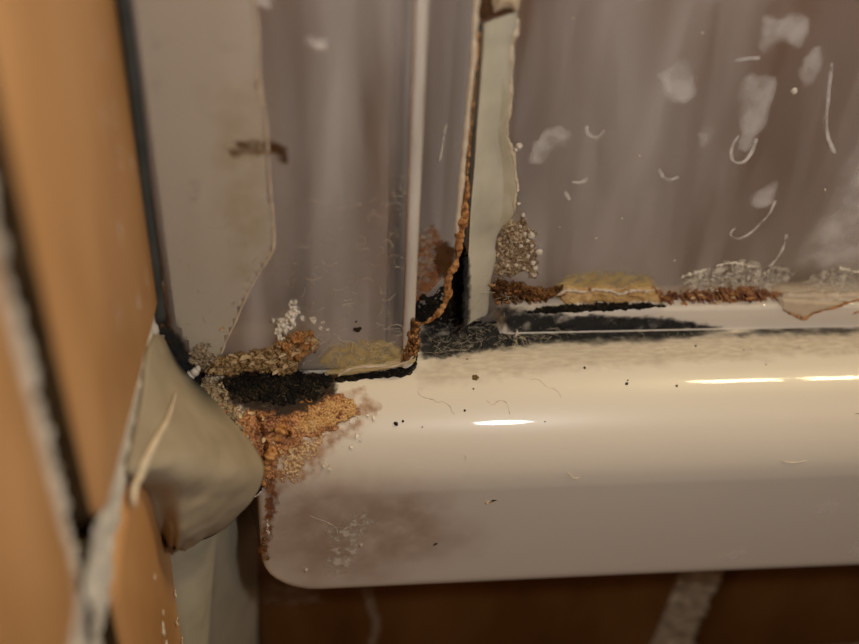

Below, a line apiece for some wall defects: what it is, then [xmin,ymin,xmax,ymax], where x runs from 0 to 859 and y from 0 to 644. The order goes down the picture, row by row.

peeling [492,0,520,12]
rust [400,0,483,363]
damp [218,244,721,407]
rust [489,272,784,306]
damp [738,327,859,336]
rust [200,329,373,561]